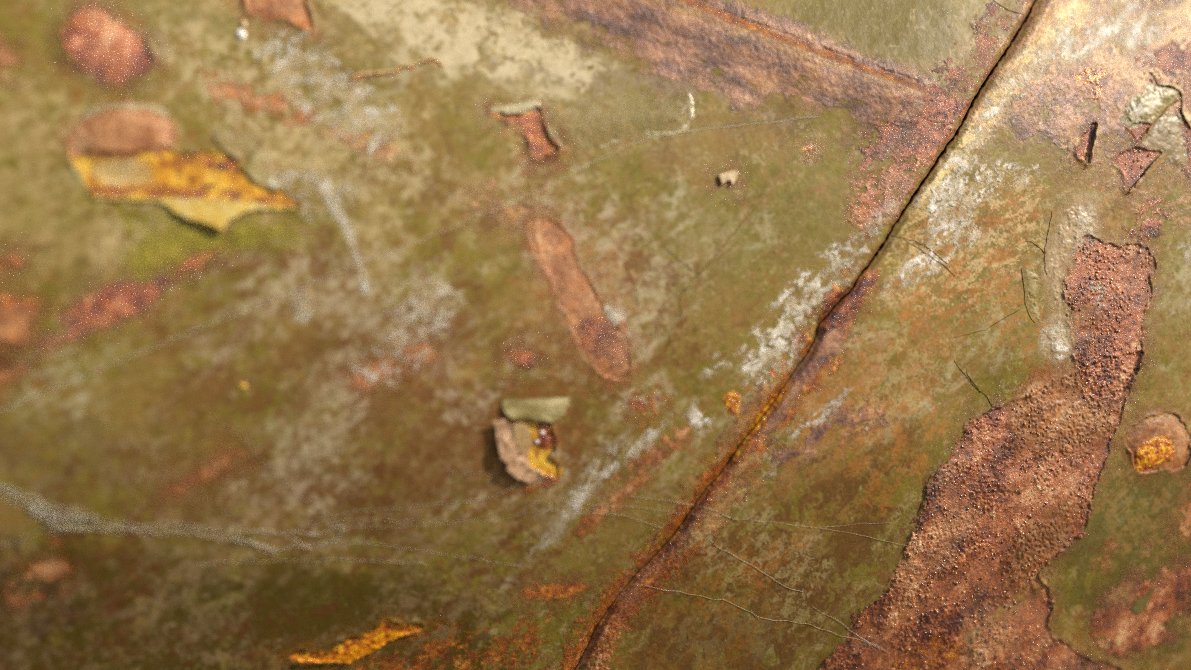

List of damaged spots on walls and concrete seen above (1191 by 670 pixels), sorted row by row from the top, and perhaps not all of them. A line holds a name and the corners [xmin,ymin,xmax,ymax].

rust [59,1,159,88]
peeling [240,0,316,36]
peeling [66,99,299,230]
efflorescence [882,0,1164,297]
peeling [1121,67,1191,168]
rust [0,242,227,355]
efflorescence [705,205,894,395]
crack [573,0,1052,670]
rust [507,0,1191,670]
peeling [491,397,570,489]
rust [289,268,890,670]
damp [791,400,838,439]